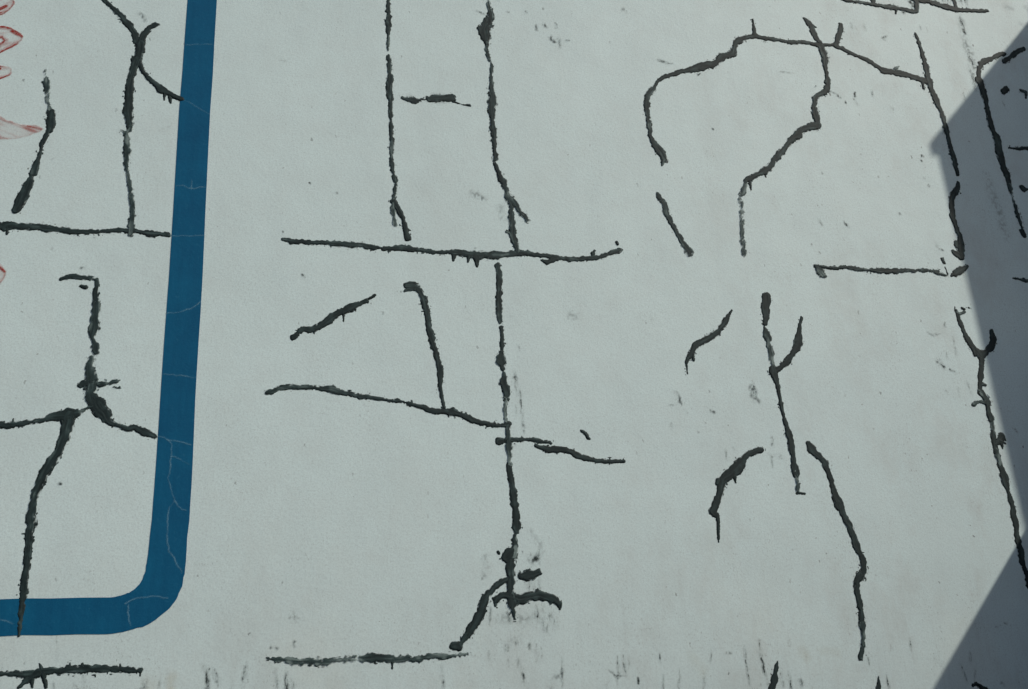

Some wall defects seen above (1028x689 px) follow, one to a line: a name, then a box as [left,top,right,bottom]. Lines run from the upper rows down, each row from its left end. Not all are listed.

crack [0,0,184,238]
crack [643,0,989,277]
crack [975,47,1028,238]
crack [0,273,157,637]
crack [265,0,626,670]
crack [684,309,733,375]
crack [708,292,881,689]
crack [954,306,1028,589]
crack [0,660,143,689]
crack [971,681,988,689]